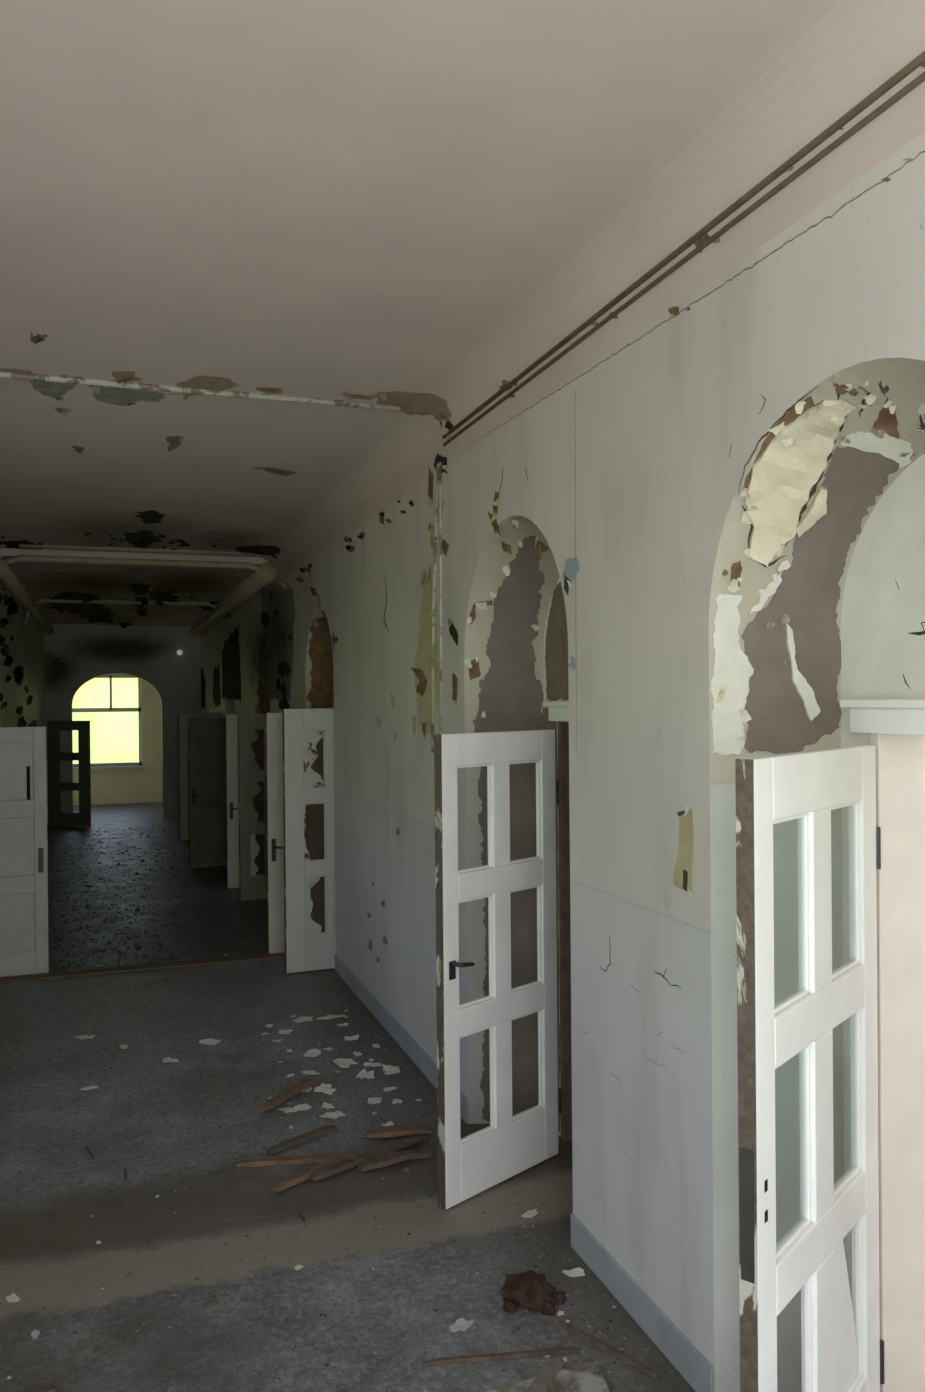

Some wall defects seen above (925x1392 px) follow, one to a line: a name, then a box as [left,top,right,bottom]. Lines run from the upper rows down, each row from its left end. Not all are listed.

peeling [0,367,283,416]
peeling [342,390,456,440]
peeling [379,453,449,557]
peeling [710,392,925,755]
peeling [255,563,338,714]
peeling [376,491,580,779]
peeling [478,766,488,866]
peeling [509,763,536,861]
peeling [673,805,694,895]
peeling [510,887,538,988]
peeling [480,1029,490,1122]
peeling [512,1012,539,1116]